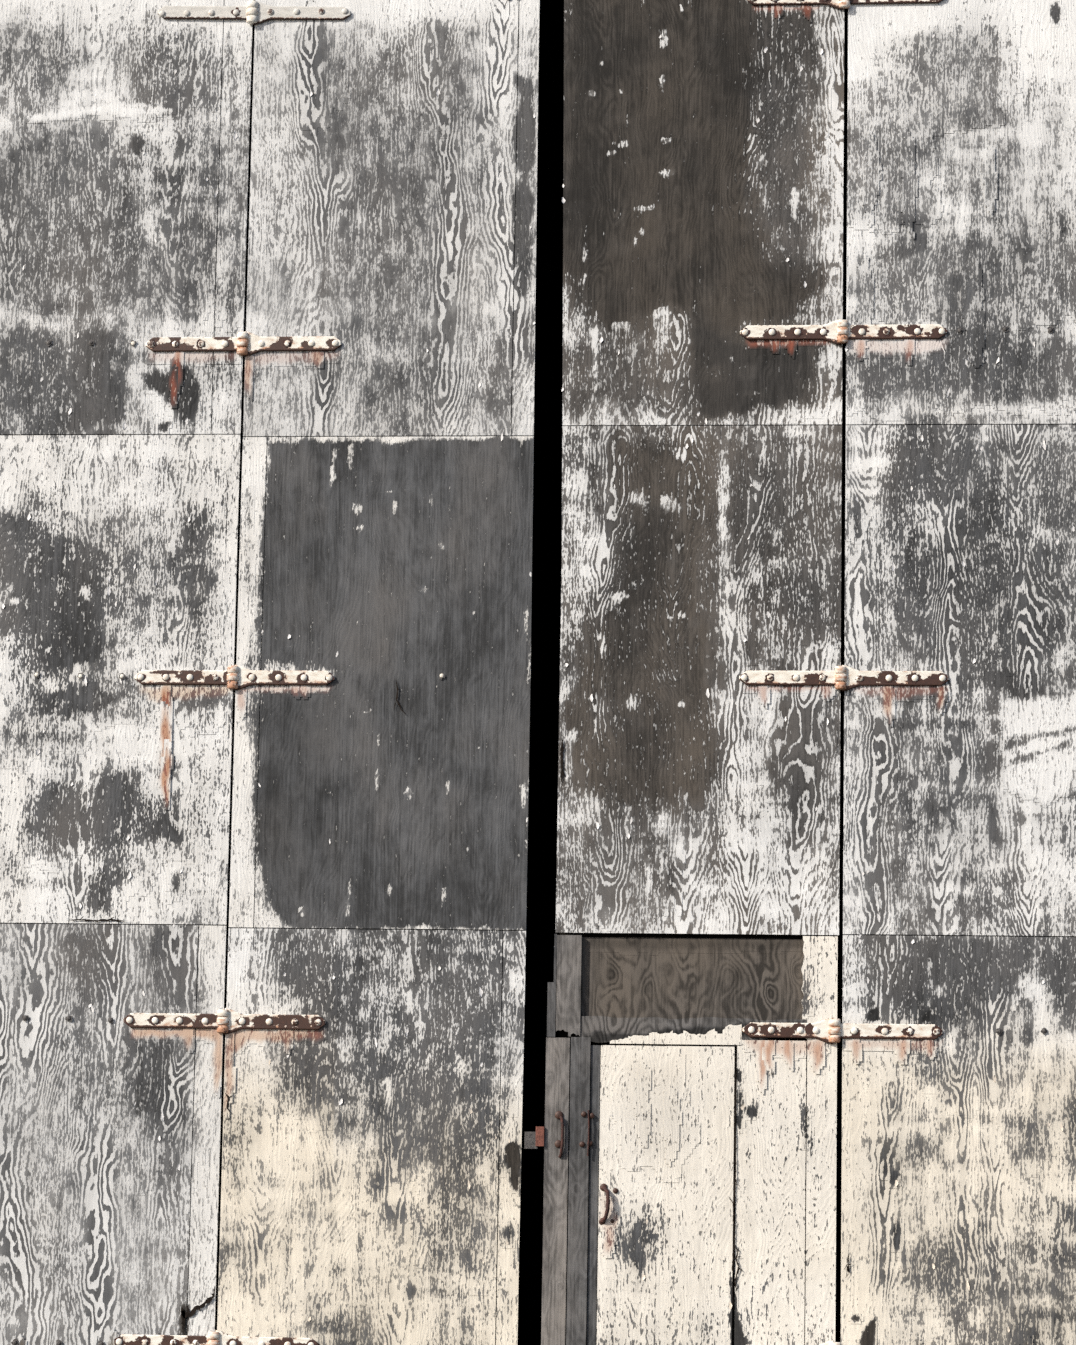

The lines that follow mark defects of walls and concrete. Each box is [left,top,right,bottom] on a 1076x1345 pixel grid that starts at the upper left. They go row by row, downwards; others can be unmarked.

peeling [0,0,251,434]
corrosion [144,339,344,408]
corrosion [740,326,951,365]
peeling [556,0,1076,933]
corrosion [136,672,336,810]
peeling [0,70,538,1306]
corrosion [739,673,950,727]
peeling [759,691,1076,1258]
corrosion [126,1007,327,1118]
corrosion [742,1026,944,1094]
crack [181,1288,215,1335]
peeling [888,1217,1057,1345]